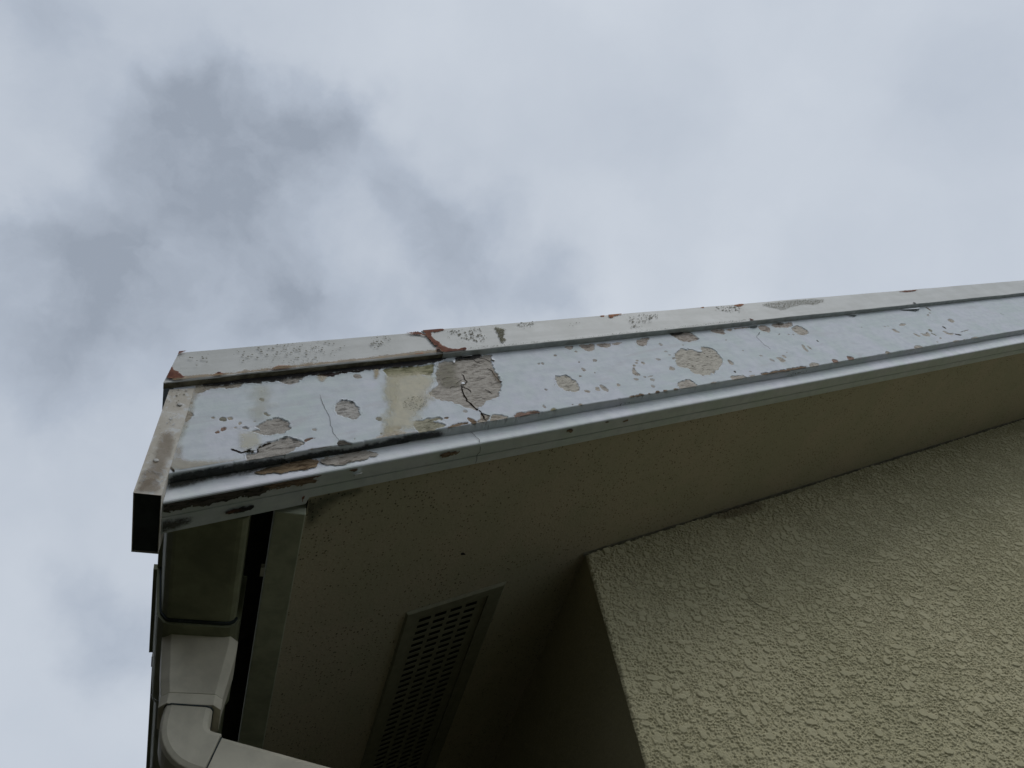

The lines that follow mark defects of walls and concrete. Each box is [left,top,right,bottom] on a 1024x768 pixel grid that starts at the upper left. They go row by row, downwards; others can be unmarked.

corrosion [167,328,466,380]
peeling [166,355,556,434]
crack [441,358,501,464]
peeling [544,342,622,405]
peeling [630,322,819,397]
peeling [884,307,978,348]
peeling [163,398,378,513]